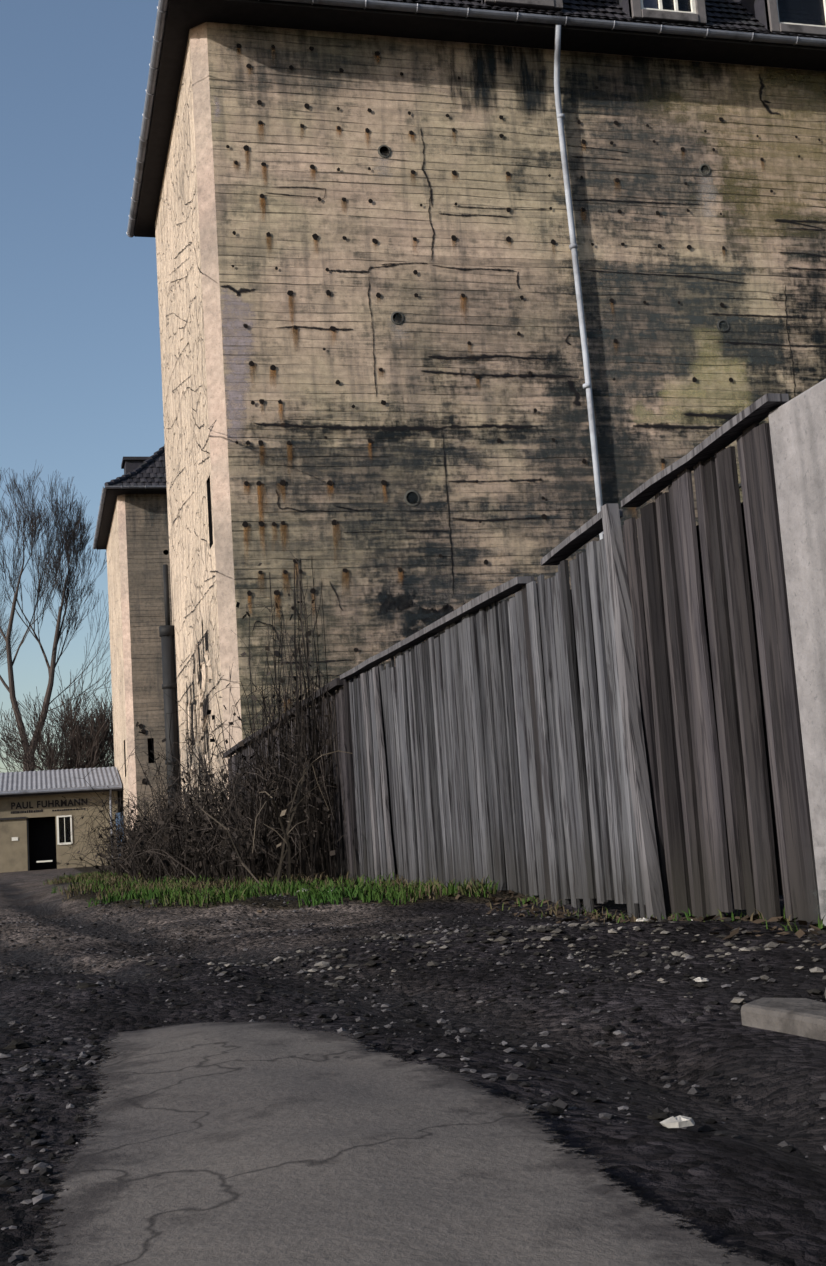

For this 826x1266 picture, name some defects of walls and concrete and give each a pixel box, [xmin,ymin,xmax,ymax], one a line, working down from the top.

water stain [236,25,400,85]
crack [759,74,780,115]
corrosion [234,145,266,175]
corrosion [287,290,298,343]
crack [254,129,703,594]
water stain [285,43,826,655]
crack [165,138,256,763]
corrosion [242,481,286,541]
corrosion [274,558,298,604]
crack [252,621,347,678]